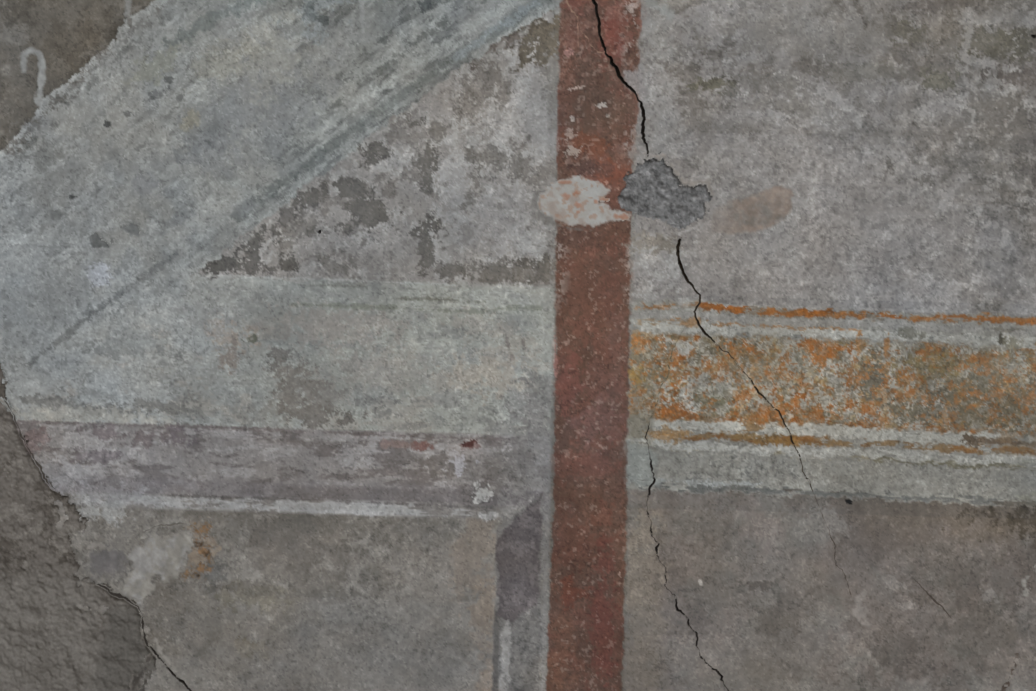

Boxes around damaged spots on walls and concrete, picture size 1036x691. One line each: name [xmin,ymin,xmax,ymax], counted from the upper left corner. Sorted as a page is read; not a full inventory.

crack [564,0,651,158]
spalling [537,151,795,236]
crack [635,236,854,691]
crack [148,637,194,691]